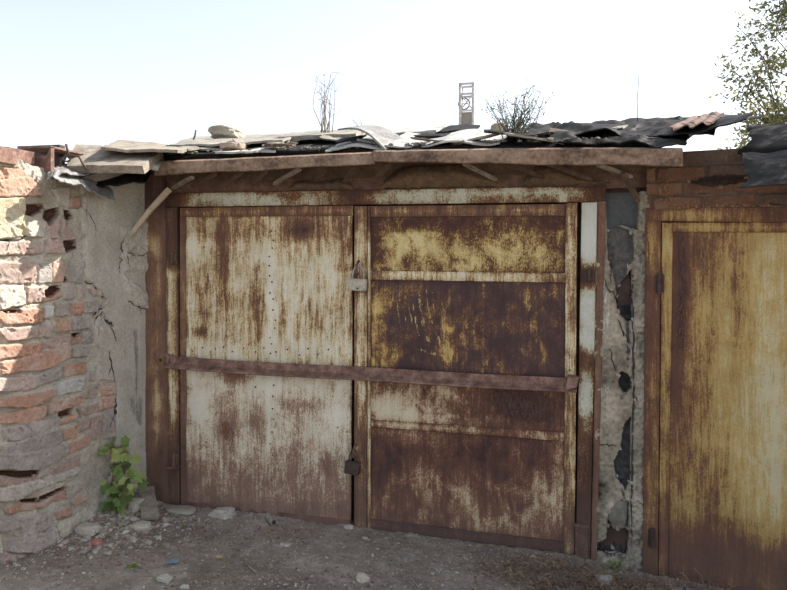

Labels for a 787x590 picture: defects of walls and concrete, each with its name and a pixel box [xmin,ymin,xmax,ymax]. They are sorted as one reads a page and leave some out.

spalling [607,227,634,321]
spalling [616,372,632,394]
spalling [614,417,633,486]
spalling [596,500,630,554]